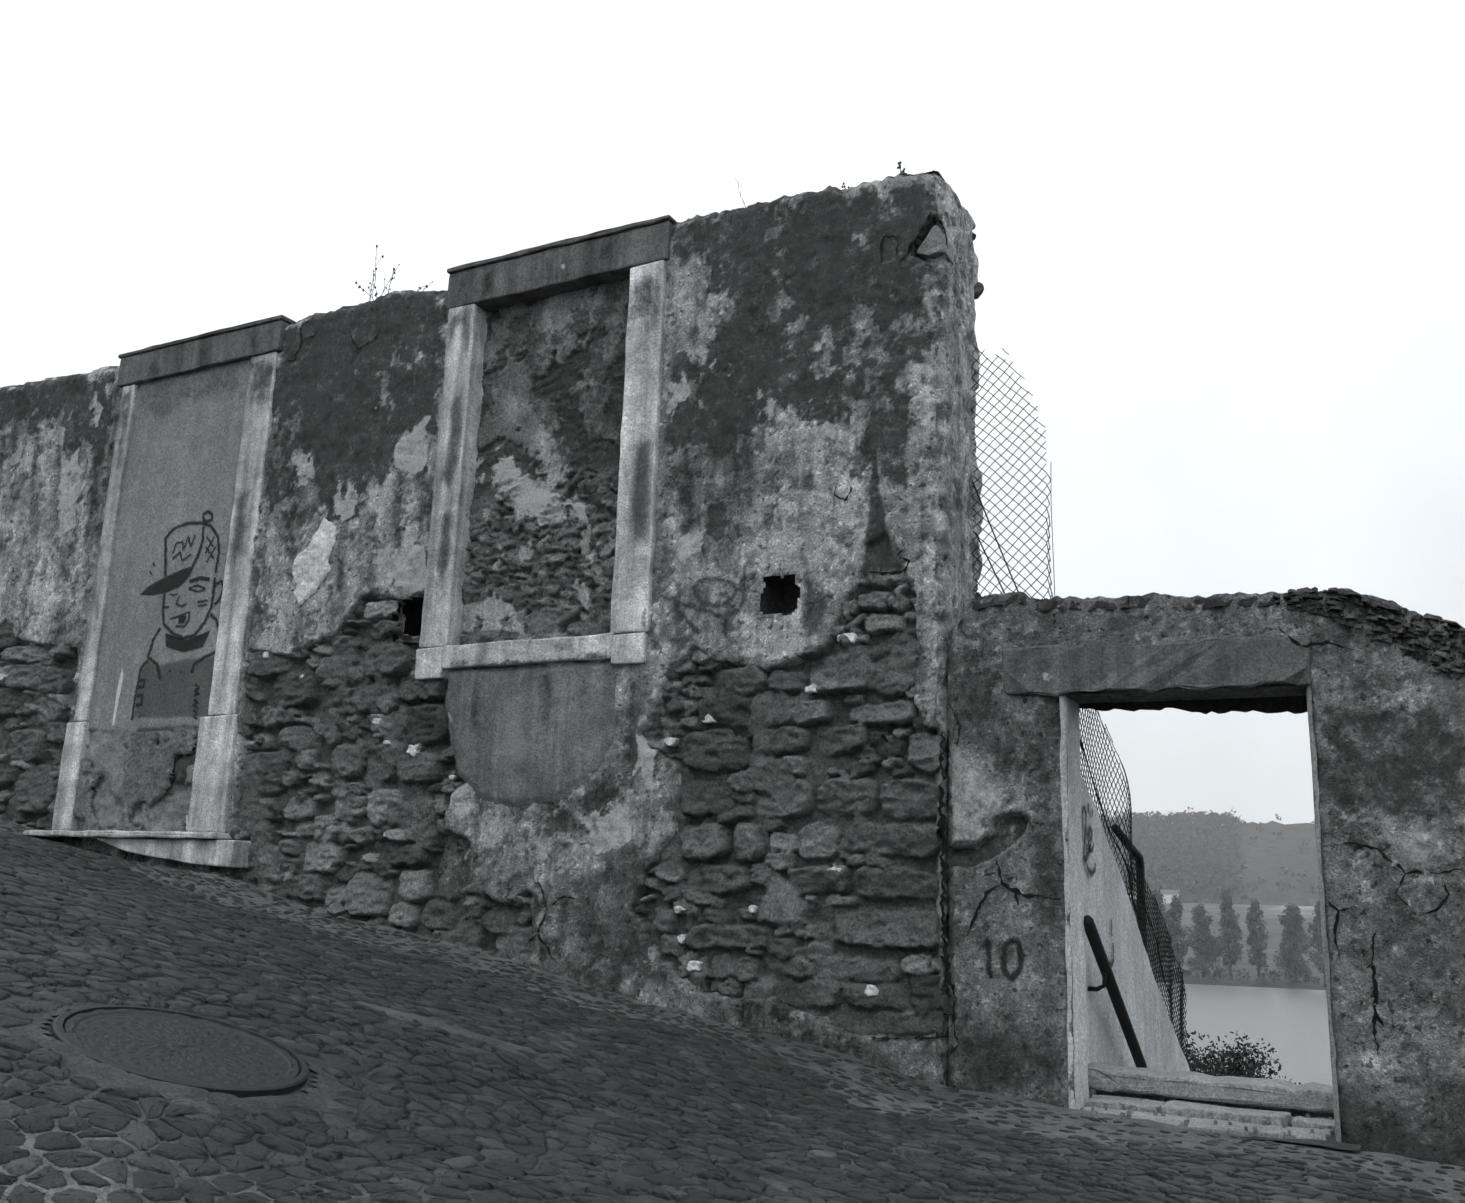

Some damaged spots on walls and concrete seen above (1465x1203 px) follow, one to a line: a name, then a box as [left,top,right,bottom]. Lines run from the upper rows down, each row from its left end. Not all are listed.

water stain [0,371,130,565]
flaking render [292,518,337,606]
water stain [246,291,467,596]
water stain [664,181,952,572]
spalling [0,621,79,840]
flaking render [73,730,198,831]
spalling [234,593,532,961]
spalling [634,573,1029,1041]
crack [872,707,1061,1054]
crack [1328,901,1385,1053]
crack [1323,841,1463,916]